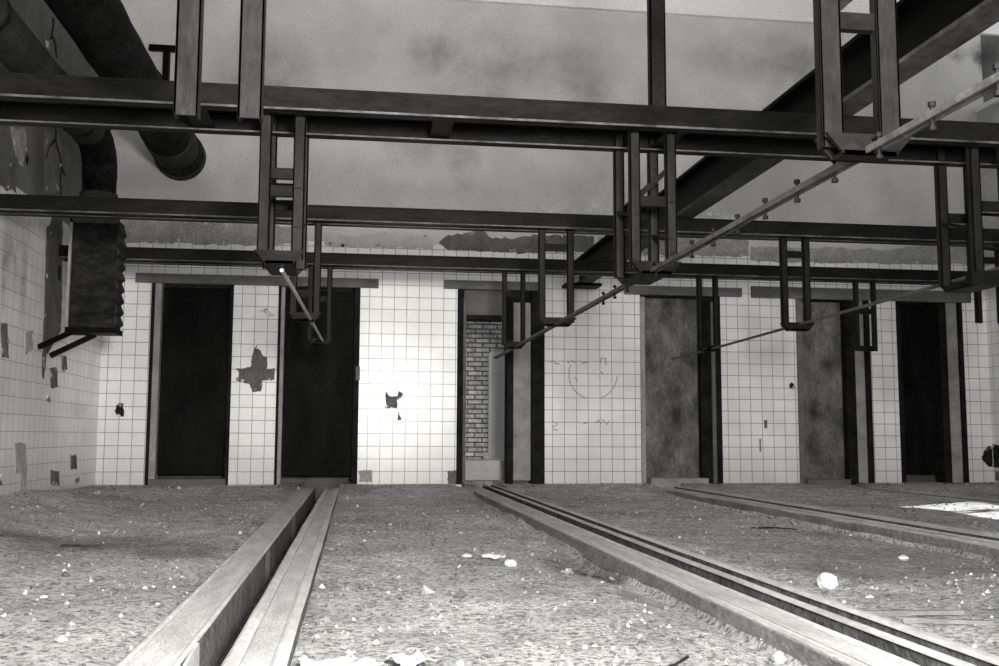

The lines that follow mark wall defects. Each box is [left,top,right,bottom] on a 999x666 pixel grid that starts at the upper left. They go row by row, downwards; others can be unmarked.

peeling [0,126,29,194]
spalling [0,323,10,359]
spalling [236,345,275,392]
spalling [384,391,403,420]
spalling [14,442,27,491]